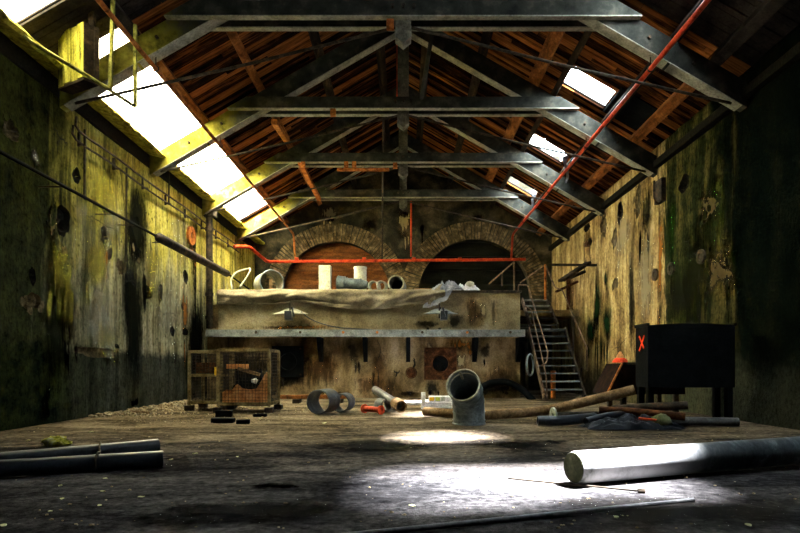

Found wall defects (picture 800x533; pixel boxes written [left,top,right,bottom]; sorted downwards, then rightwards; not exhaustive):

spalling [698,181,721,227]
leakage [46,264,78,377]
leakage [103,186,161,383]
corrosion [467,299,481,325]
spalling [704,238,734,295]